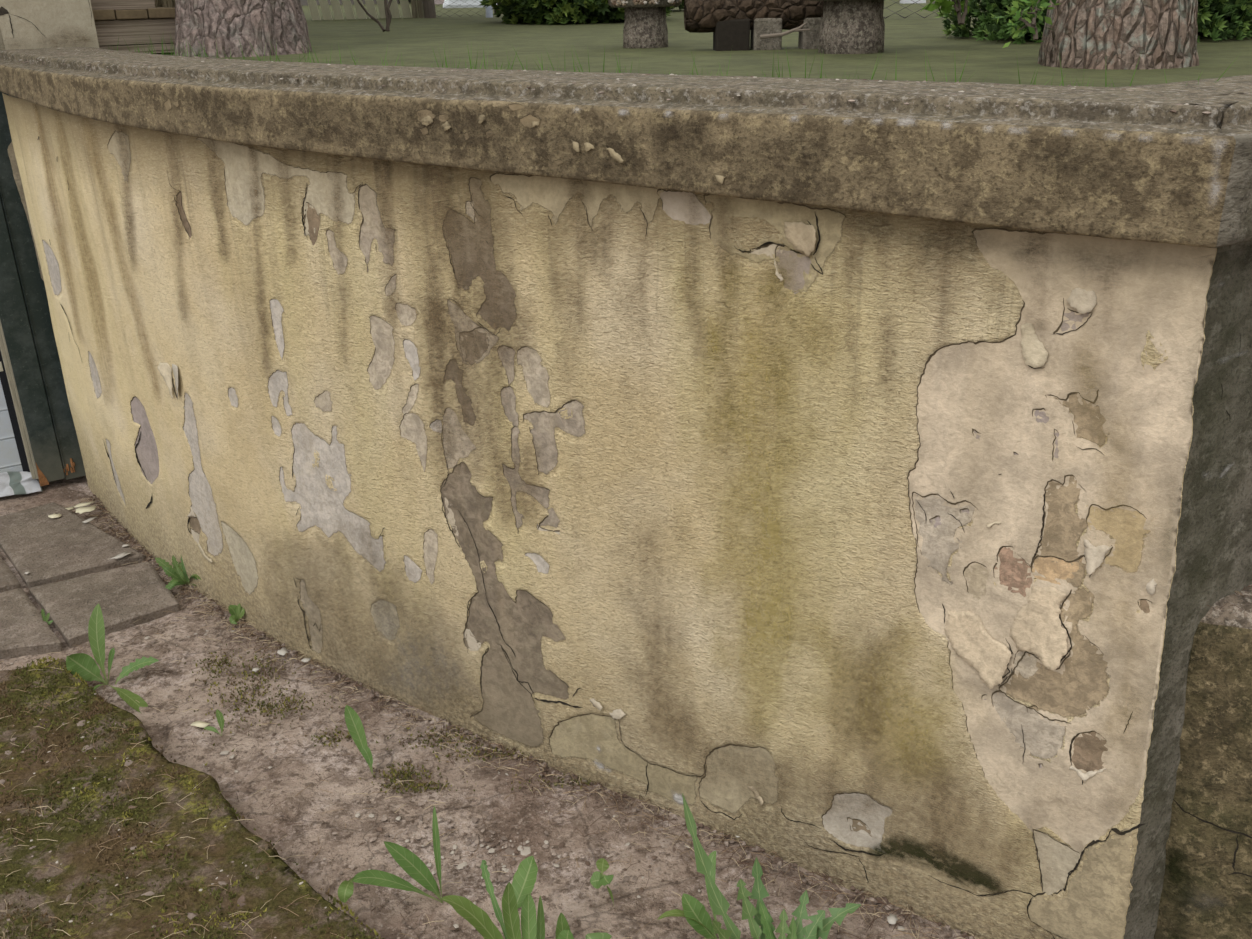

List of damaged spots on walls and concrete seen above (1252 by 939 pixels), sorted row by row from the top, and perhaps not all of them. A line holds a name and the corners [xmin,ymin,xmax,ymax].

damp [425,168,520,449]
peeling [130,396,159,484]
peeling [157,362,258,595]
peeling [196,137,847,820]
peeling [907,228,1216,895]
crack [781,809,868,881]
spalling [821,792,892,856]
crack [928,824,1144,939]
crack [1172,799,1252,877]